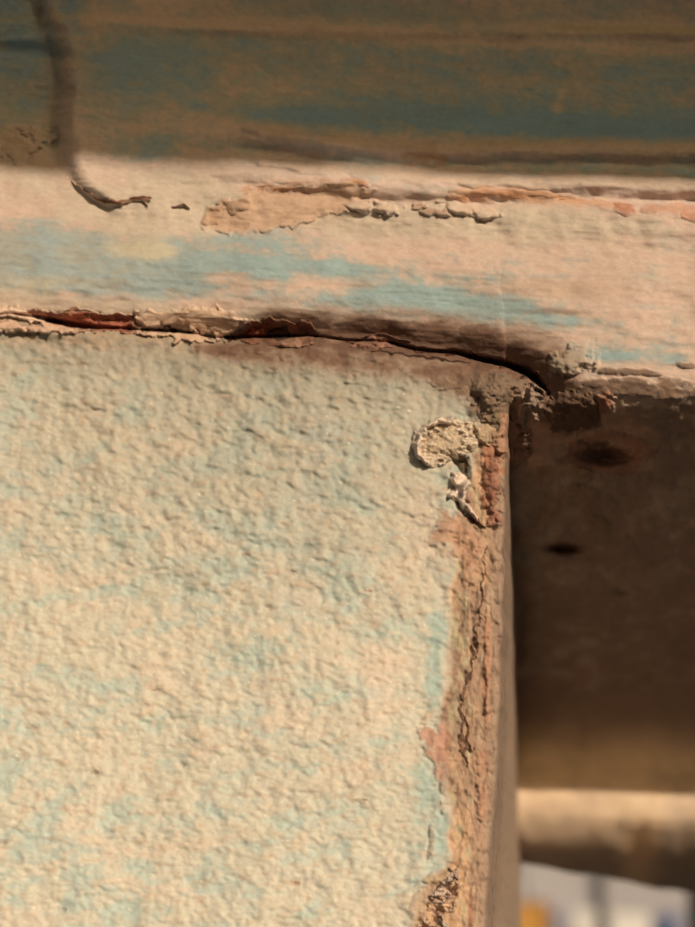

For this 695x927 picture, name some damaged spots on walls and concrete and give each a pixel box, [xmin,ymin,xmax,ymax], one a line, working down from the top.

spalling [199,180,504,238]
crack [51,305,239,343]
peeling [0,303,315,348]
spalling [349,334,393,349]
crack [314,333,555,423]
water stain [188,293,695,442]
crack [457,545,489,767]
spalling [416,864,463,927]